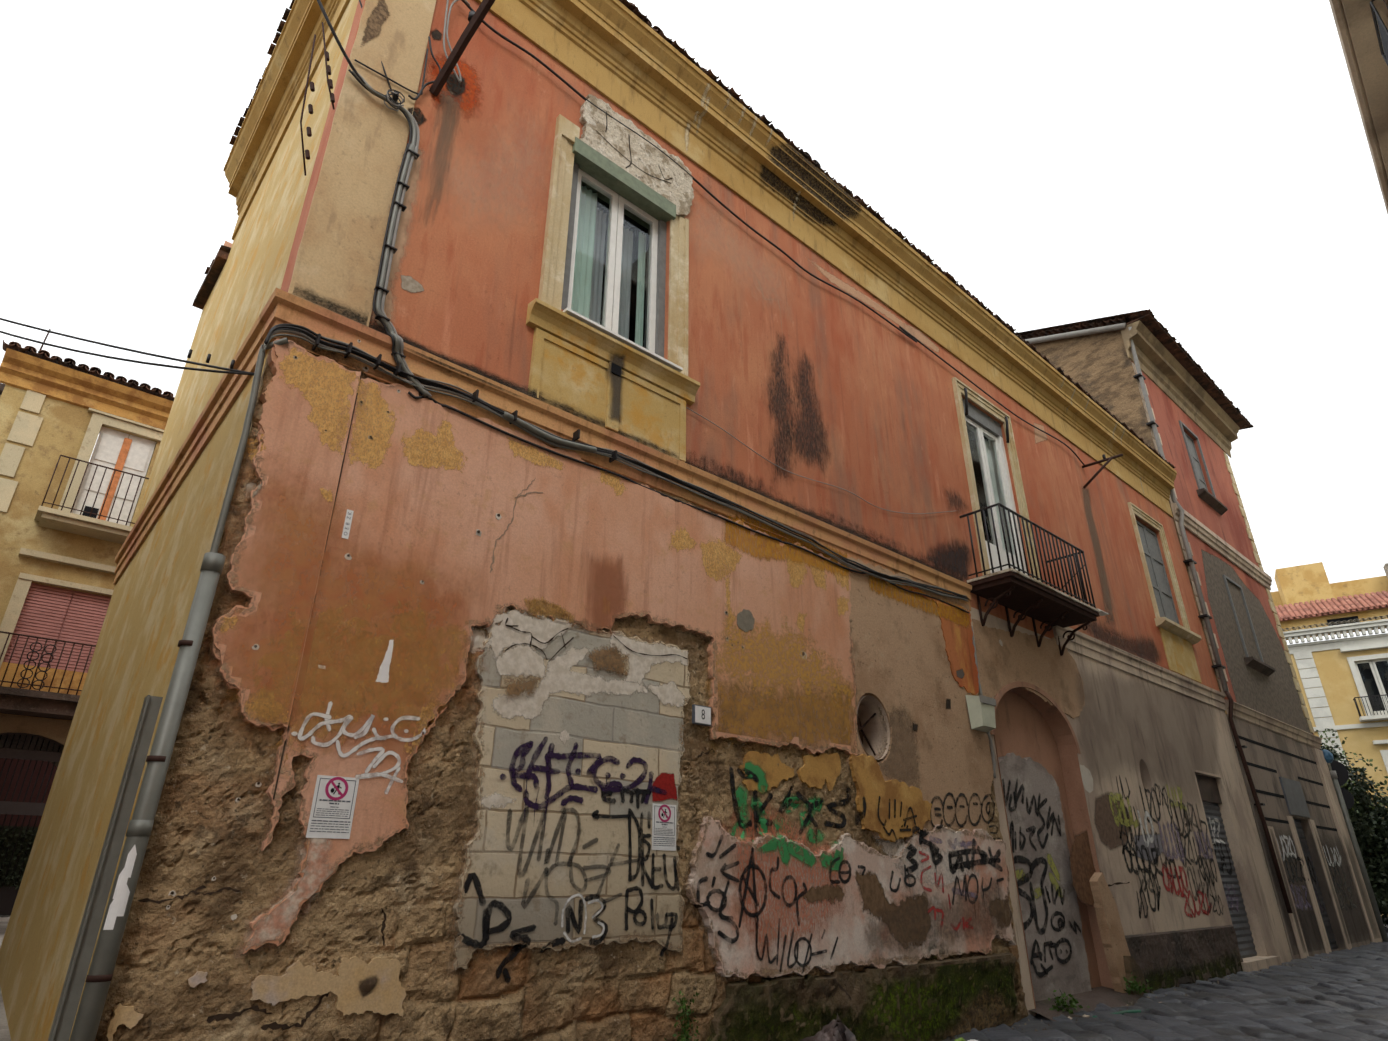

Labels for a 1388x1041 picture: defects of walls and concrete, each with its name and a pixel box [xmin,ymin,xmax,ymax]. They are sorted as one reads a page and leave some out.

rust [430,56,480,114]
spalling [579,94,694,218]
leakage [727,97,861,226]
leakage [293,291,969,584]
spalling [95,346,1029,1041]